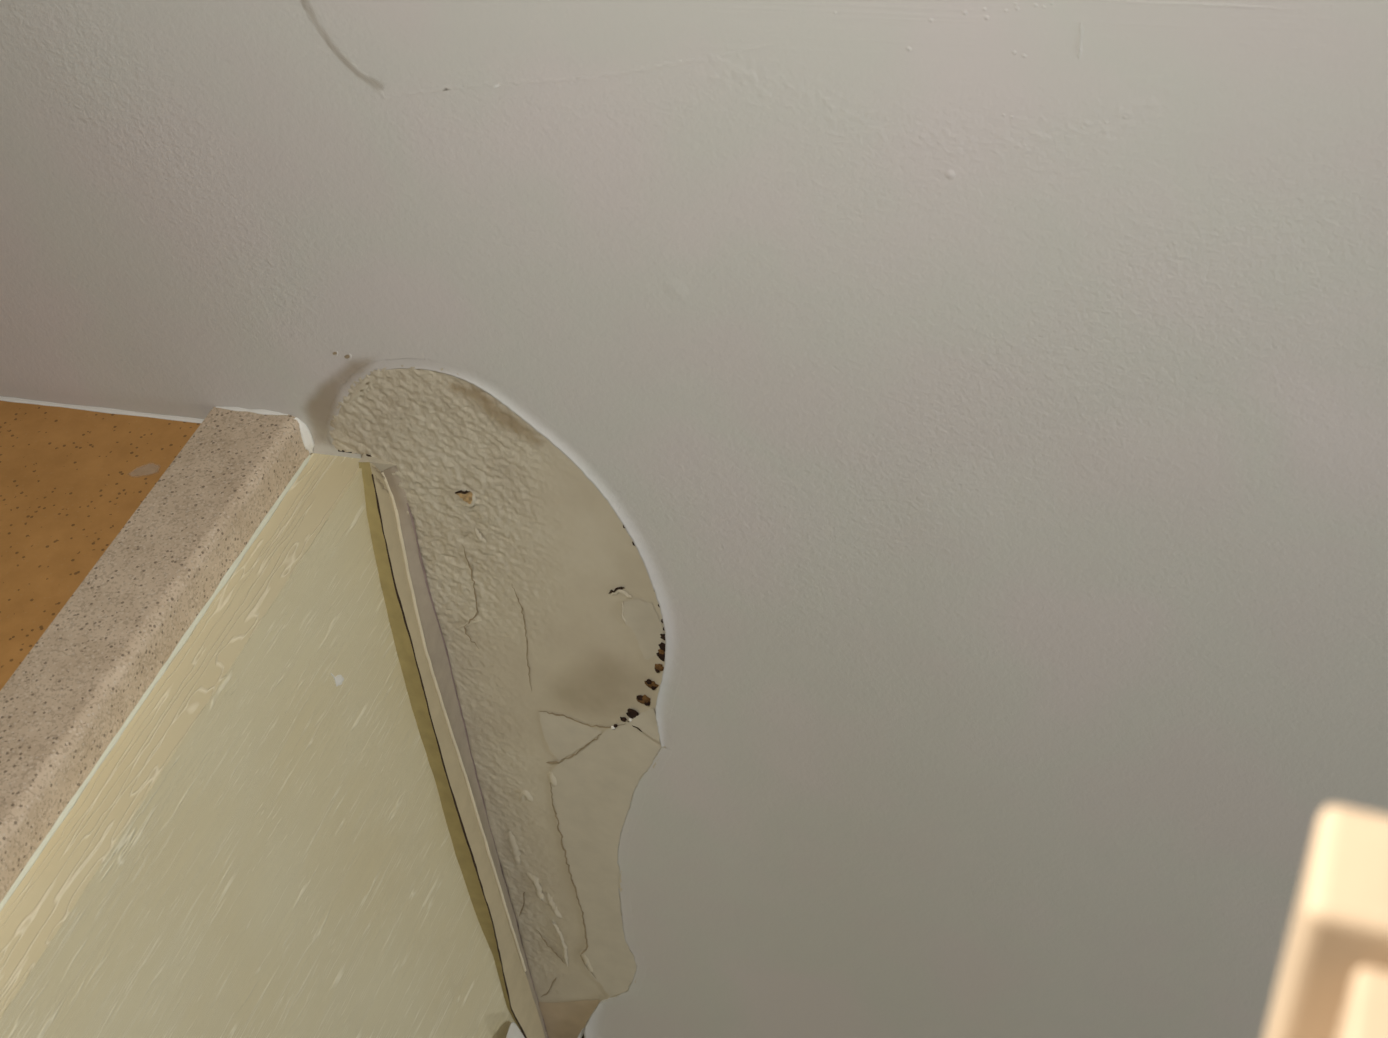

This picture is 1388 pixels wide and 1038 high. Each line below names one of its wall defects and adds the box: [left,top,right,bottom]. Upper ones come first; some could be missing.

peeling [326,351,685,1038]